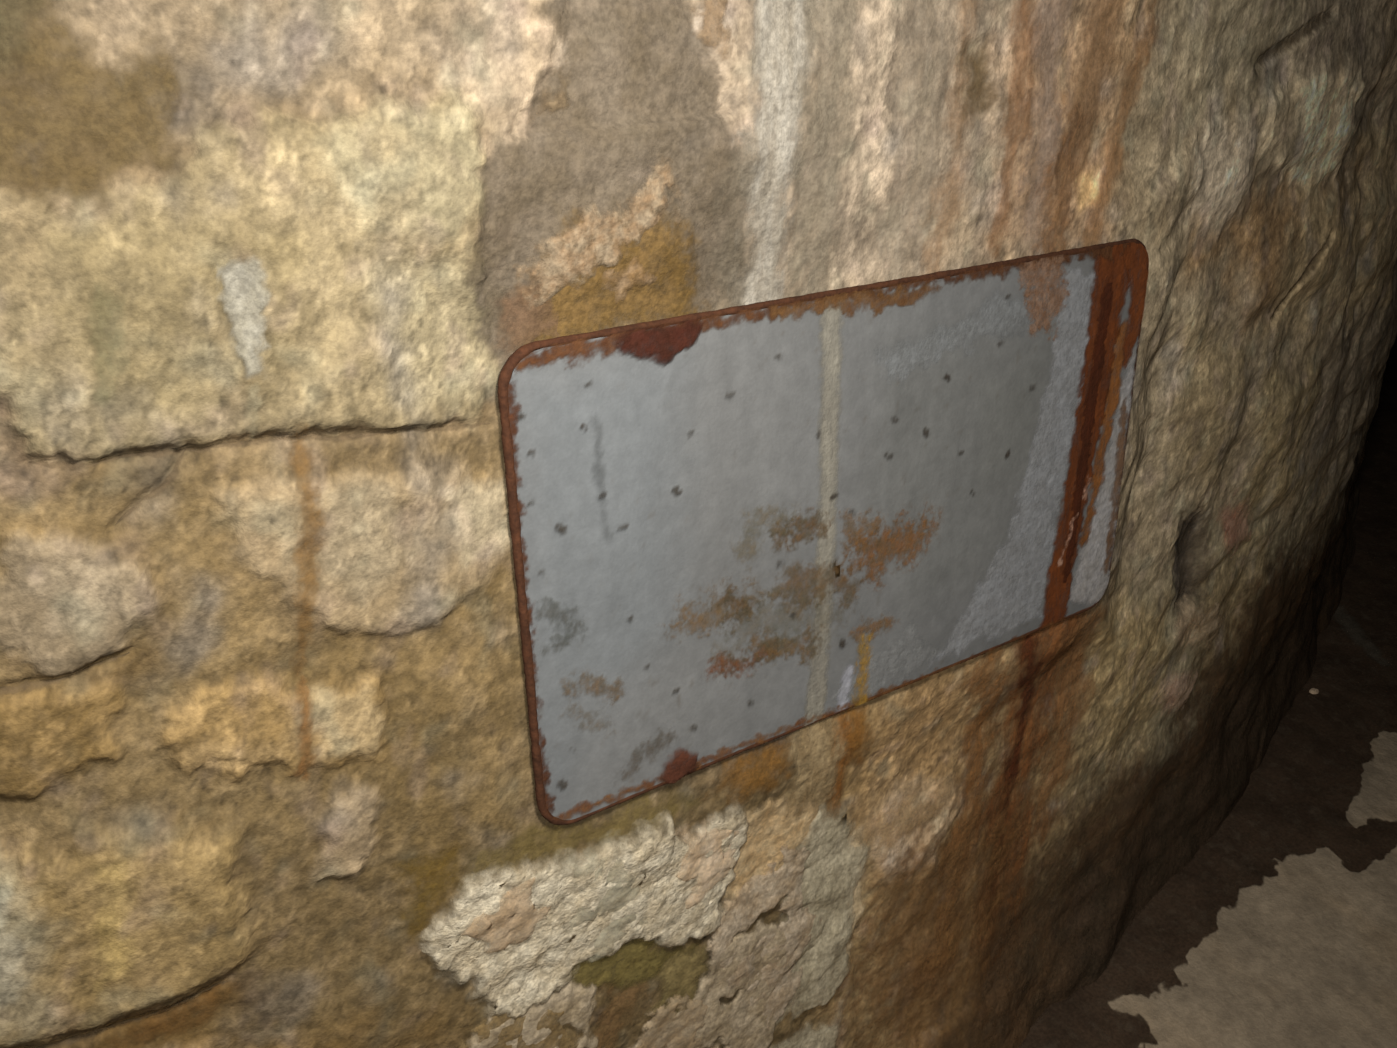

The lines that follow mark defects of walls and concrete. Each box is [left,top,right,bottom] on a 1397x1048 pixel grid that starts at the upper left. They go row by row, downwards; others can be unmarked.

corrosion [507,0,1154,820]
spalling [424,799,821,1048]